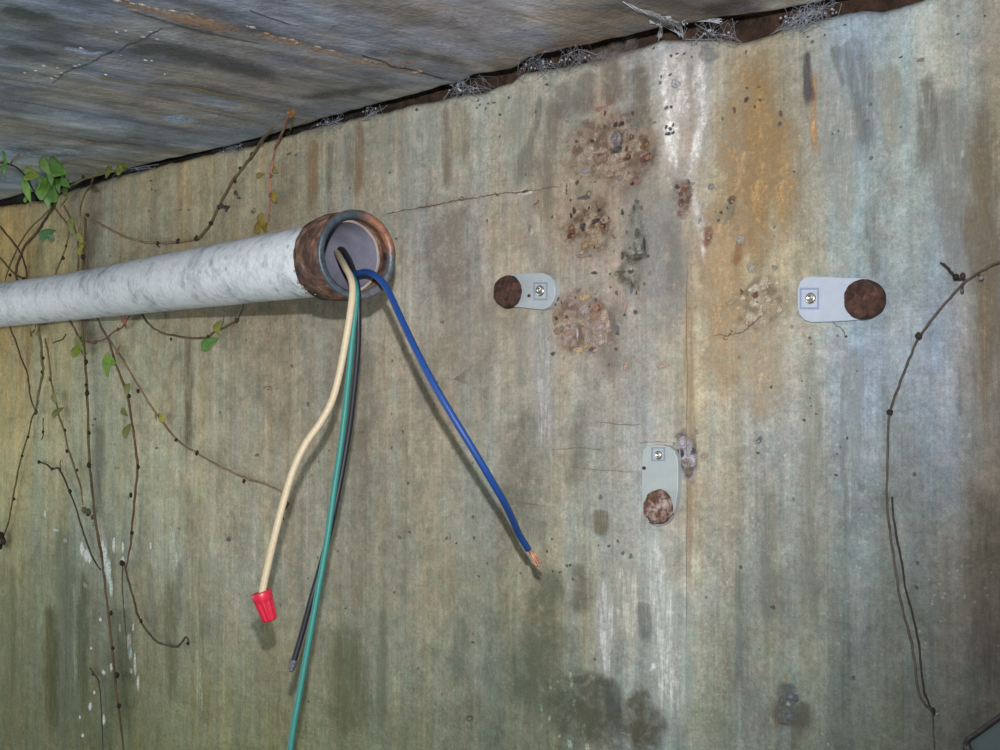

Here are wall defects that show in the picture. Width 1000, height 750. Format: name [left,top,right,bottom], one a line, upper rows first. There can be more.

crack [55,28,161,81]
crack [388,185,567,236]
spalling [548,111,675,359]
spalling [673,429,707,480]
water stain [561,538,690,750]